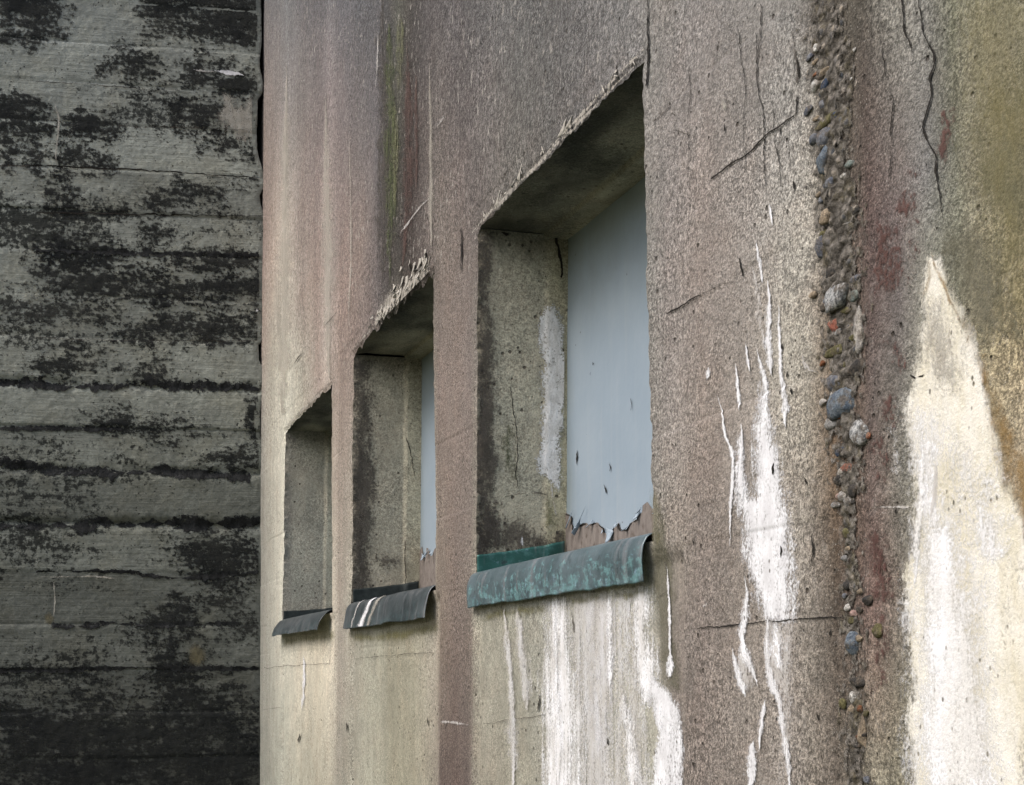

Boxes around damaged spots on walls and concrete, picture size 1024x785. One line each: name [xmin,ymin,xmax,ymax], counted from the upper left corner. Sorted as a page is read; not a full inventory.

water stain [0,0,259,452]
water stain [0,518,259,785]
spalling [349,249,433,353]
water stain [488,524,685,785]
peeling [565,502,654,552]
crack [666,282,731,314]
crack [710,4,798,187]
water stain [718,244,799,785]
crack [697,615,846,629]
spalling [791,0,883,785]
crack [881,0,943,218]
water stain [882,256,1024,785]